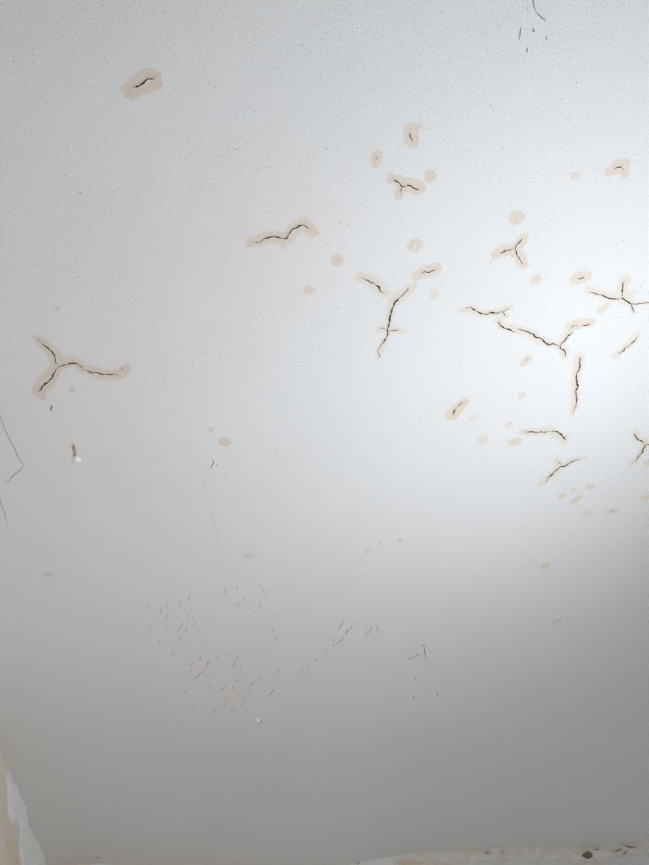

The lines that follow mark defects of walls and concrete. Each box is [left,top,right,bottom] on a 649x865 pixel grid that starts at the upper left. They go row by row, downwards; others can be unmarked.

damp [0,751,21,865]
hole [578,849,599,861]